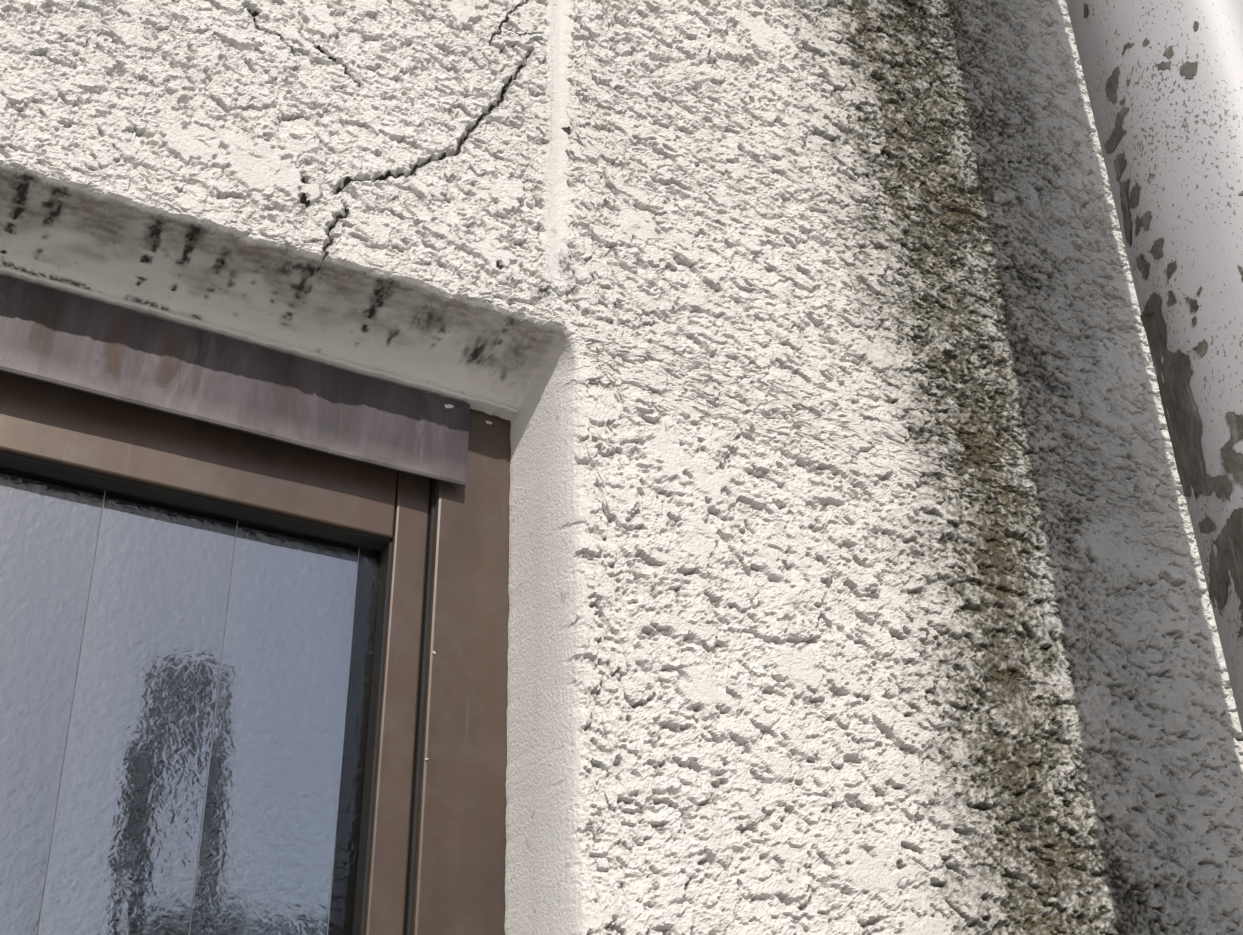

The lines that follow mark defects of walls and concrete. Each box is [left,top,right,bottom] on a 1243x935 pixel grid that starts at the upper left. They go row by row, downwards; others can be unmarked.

crack [253,18,360,87]
crack [316,0,542,272]
water stain [0,174,124,235]
water stain [140,220,210,265]
water stain [216,239,348,299]
water stain [362,280,400,332]
water stain [468,345,484,362]
water stain [830,0,1178,935]